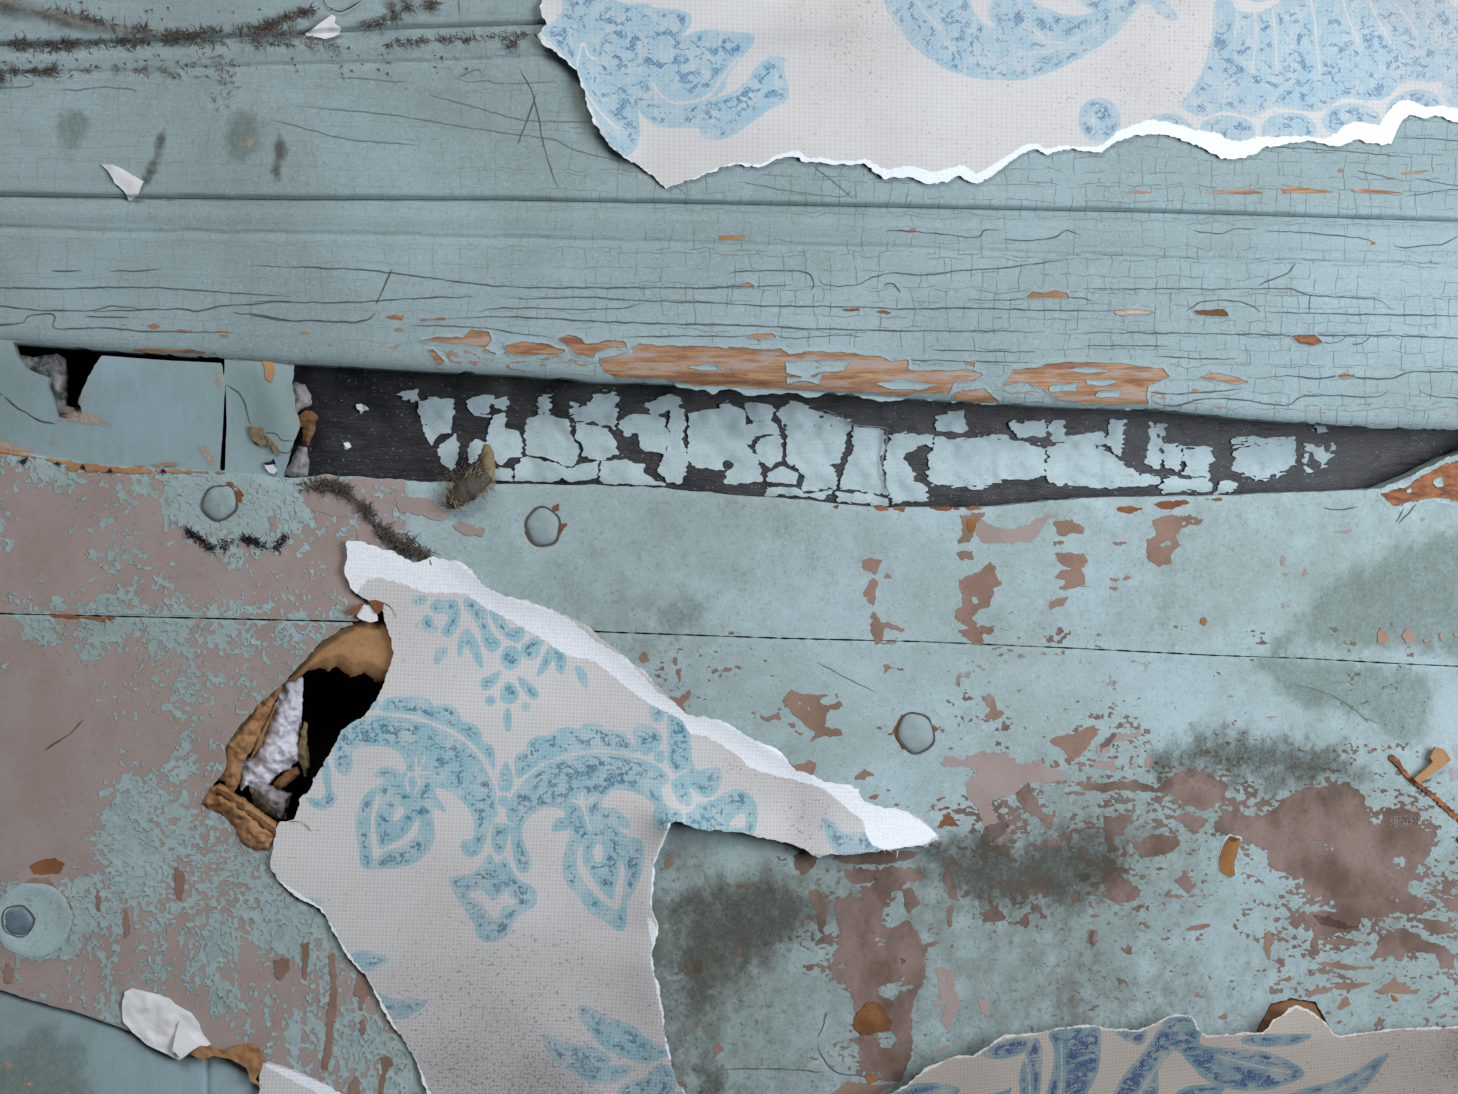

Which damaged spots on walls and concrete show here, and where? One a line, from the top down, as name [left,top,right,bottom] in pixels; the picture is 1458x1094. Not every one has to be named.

crack [272,69,641,186]
crack [743,166,852,198]
peeling [1281,170,1429,194]
crack [0,228,1458,407]
crack [0,394,55,424]
crack [823,410,891,495]
peeling [0,382,485,1094]
peeling [365,314,1458,1094]
leakage [1156,736,1355,781]
leakage [927,836,1118,905]
leakage [674,885,802,1012]